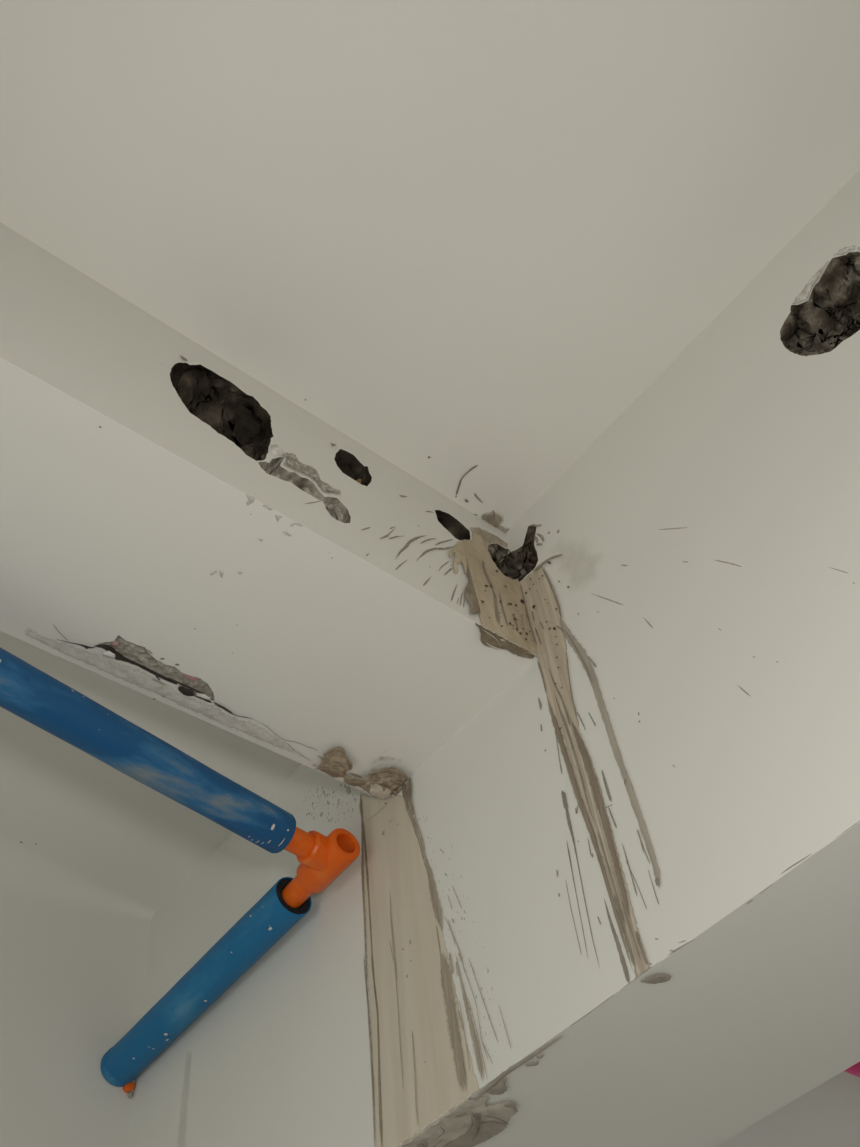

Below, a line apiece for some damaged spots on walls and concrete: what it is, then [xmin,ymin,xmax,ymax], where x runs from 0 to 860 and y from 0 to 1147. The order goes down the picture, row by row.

spalling [258,444,351,523]
spalling [488,524,559,582]
spalling [95,635,215,703]
water stain [538,657,659,982]
water stain [360,778,511,1147]